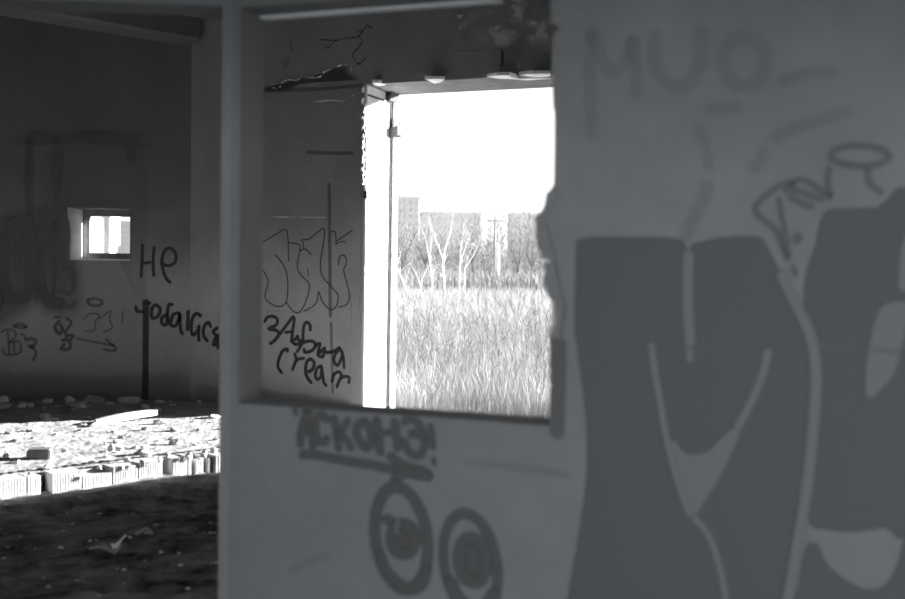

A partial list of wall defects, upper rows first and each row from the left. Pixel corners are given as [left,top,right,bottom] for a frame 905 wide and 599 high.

peeling [265,64,354,89]
crack [320,25,372,66]
spalling [350,80,386,404]
spalling [535,181,577,340]